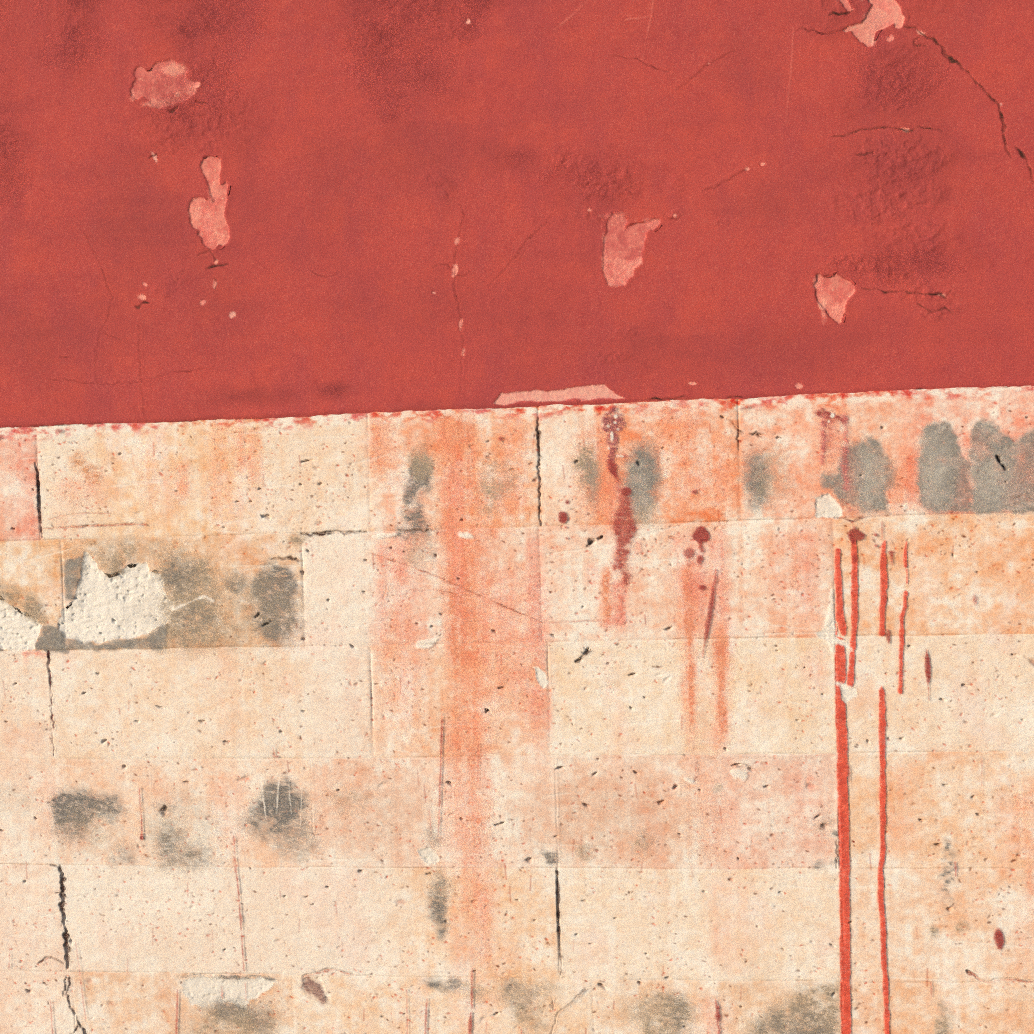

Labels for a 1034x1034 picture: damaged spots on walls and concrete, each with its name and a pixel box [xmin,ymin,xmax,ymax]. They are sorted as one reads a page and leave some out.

peeling [844,0,904,47]
crack [909,27,969,73]
peeling [189,153,230,264]
peeling [603,214,661,285]
peeling [495,385,622,405]
leakage [823,438,894,510]
leakage [916,421,1034,514]
spalling [0,552,175,653]
leakage [156,554,297,647]
leakage [51,790,119,836]
leakage [247,781,305,838]
crack [53,865,85,1031]